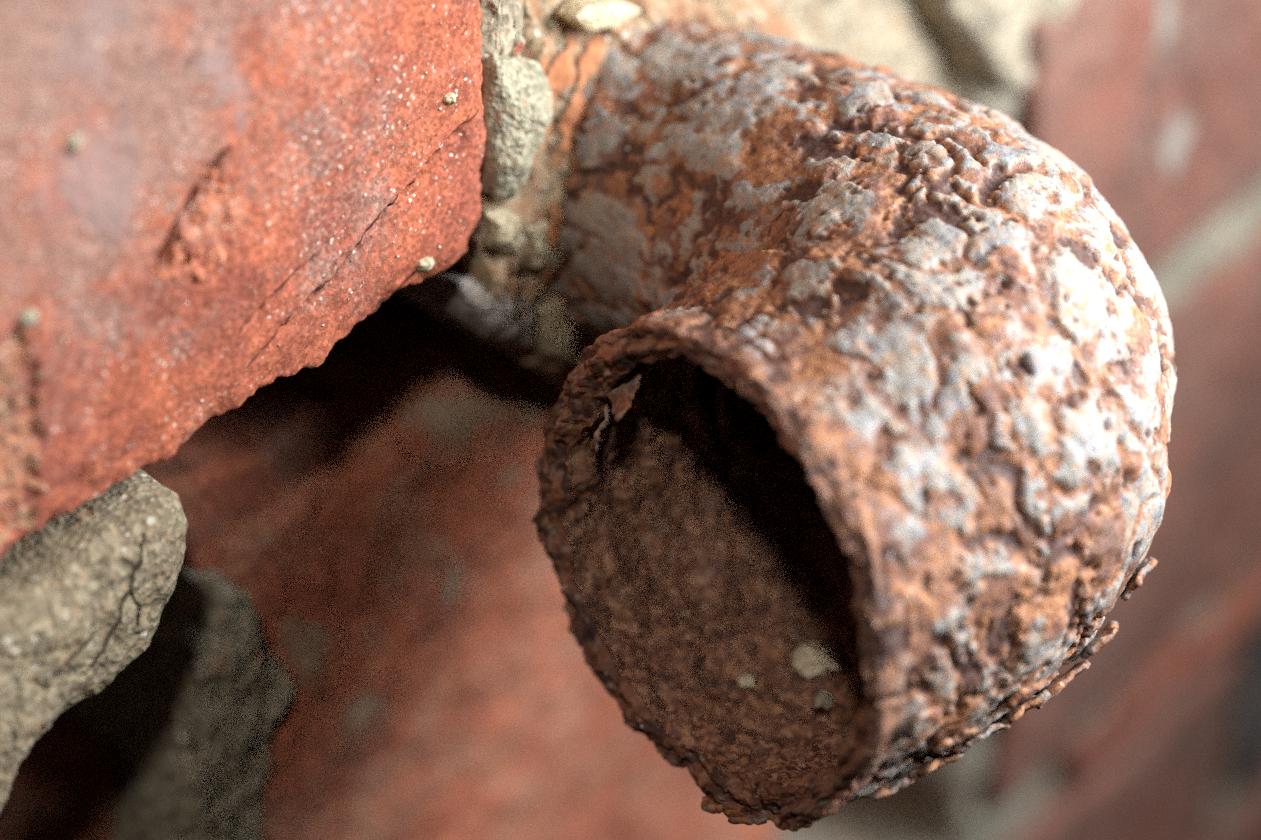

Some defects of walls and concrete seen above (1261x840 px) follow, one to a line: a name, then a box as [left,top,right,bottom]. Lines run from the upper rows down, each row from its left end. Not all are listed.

corrosion [533,32,618,166]
crack [155,145,232,281]
crack [240,109,479,368]
corrosion [593,362,648,452]
corrosion [1120,557,1158,601]
corrosion [870,621,1119,801]
corrosion [701,796,768,825]